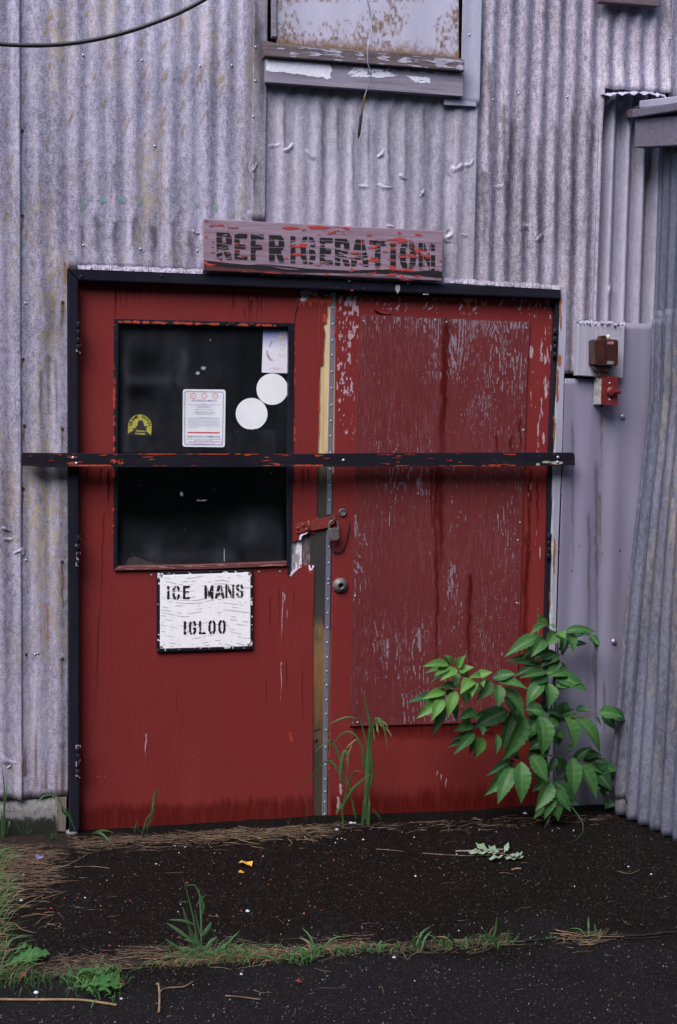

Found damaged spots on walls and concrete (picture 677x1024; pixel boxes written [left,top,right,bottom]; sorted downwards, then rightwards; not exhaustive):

corrosion [277,0,459,58]
peeling [266,47,464,83]
peeling [205,220,281,274]
peeling [283,225,350,235]
peeling [246,232,563,723]
peeling [119,509,314,587]